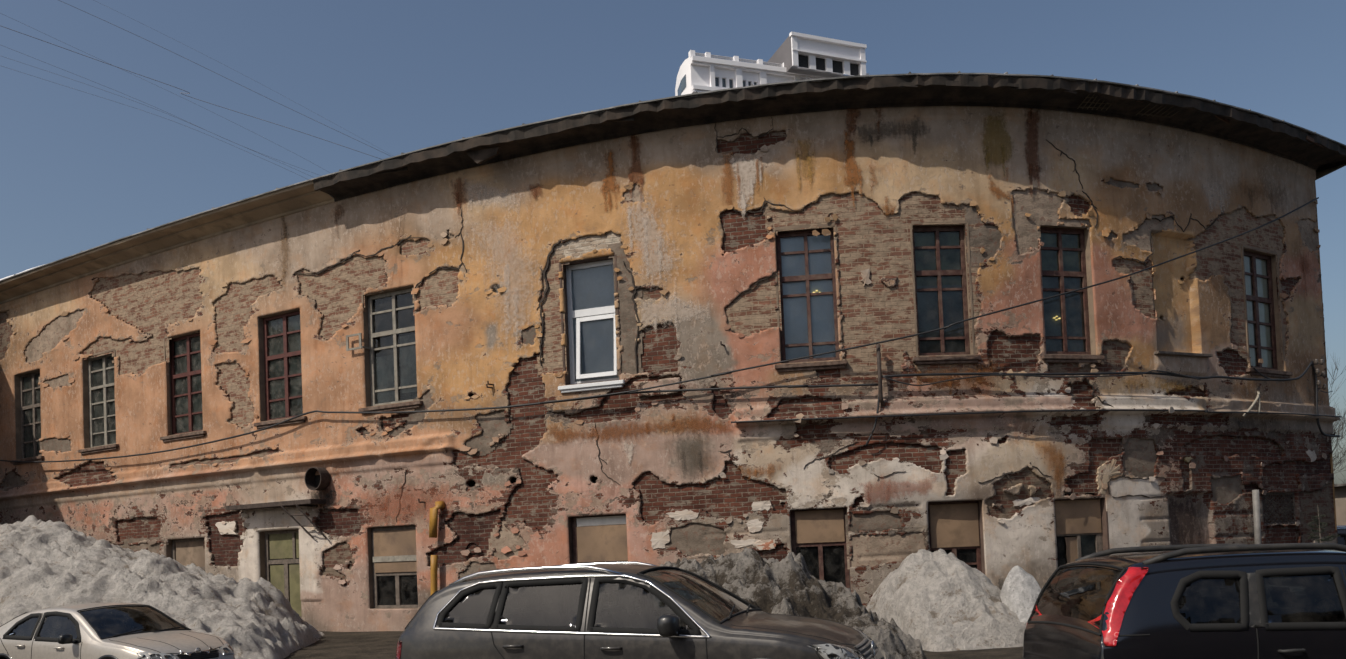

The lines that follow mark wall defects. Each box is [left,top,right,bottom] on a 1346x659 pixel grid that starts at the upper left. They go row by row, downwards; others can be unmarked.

corrosion [600,134,644,209]
spalling [717,130,787,154]
crack [1046,139,1098,227]
spalling [411,267,460,316]
spalling [1178,207,1321,376]
spalling [25,267,283,428]
spalling [720,185,1175,524]
spalling [428,231,685,579]
spalling [628,461,787,558]
spalling [757,543,788,562]
peeling [846,529,926,569]
spalling [1266,453,1336,544]